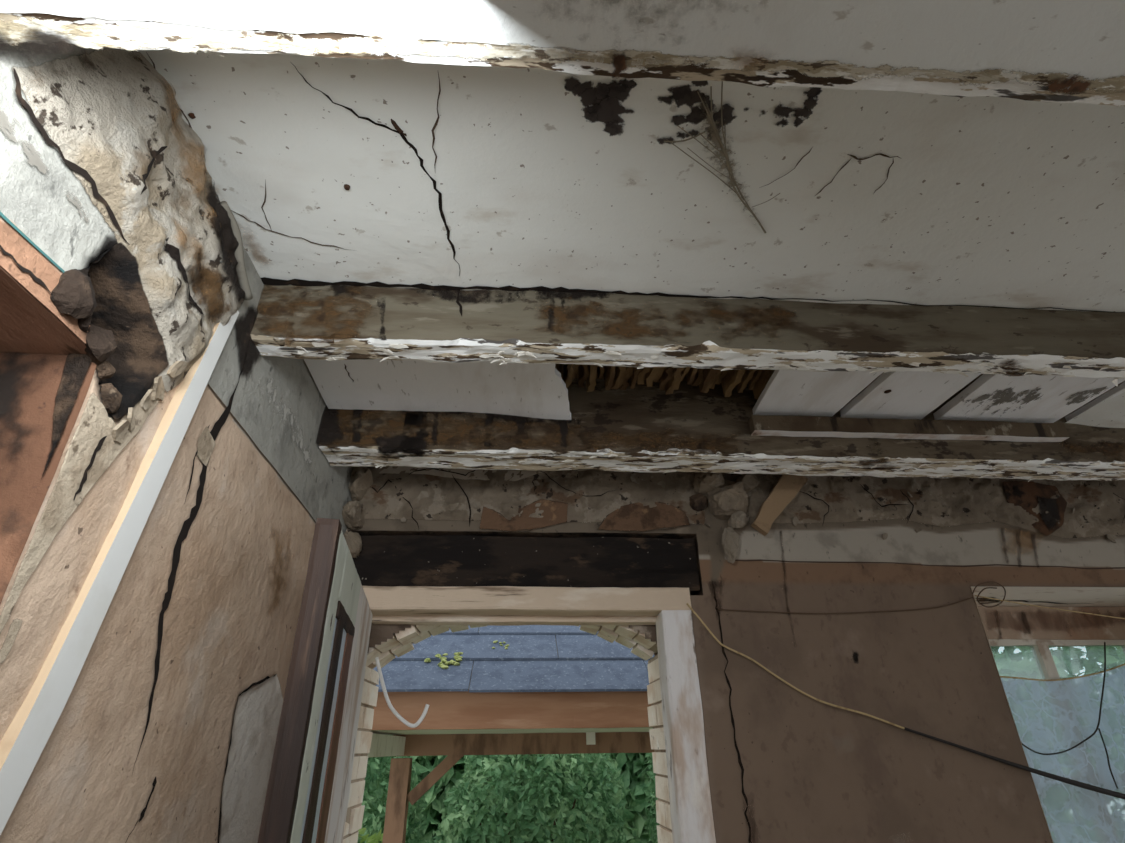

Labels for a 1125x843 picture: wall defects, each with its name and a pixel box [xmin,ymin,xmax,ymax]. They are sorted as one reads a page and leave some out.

peeling [0,17,1125,93]
leakage [565,77,637,136]
leakage [657,81,822,144]
crack [295,67,462,316]
crack [0,245,52,294]
leakage [0,352,45,454]
spalling [0,242,188,633]
peeling [962,365,1076,417]
spalling [359,451,712,533]
spalling [723,458,1125,543]
crack [126,372,241,842]
crack [710,581,756,843]